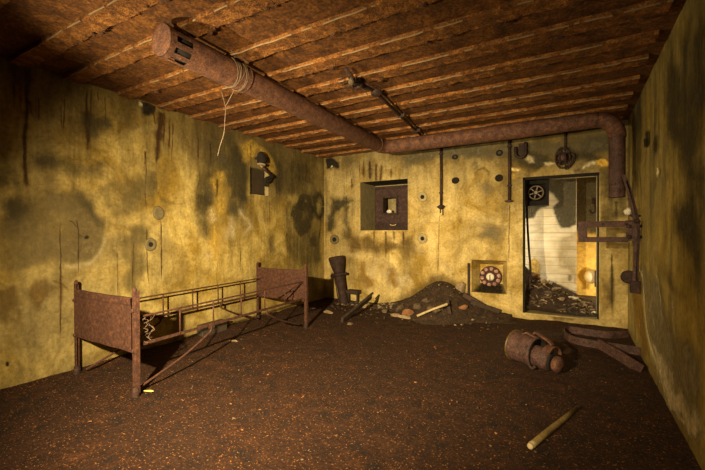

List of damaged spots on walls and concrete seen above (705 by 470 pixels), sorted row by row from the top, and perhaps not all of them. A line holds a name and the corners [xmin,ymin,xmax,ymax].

damp [664,21,705,282]
damp [1,194,105,267]
damp [275,162,412,264]